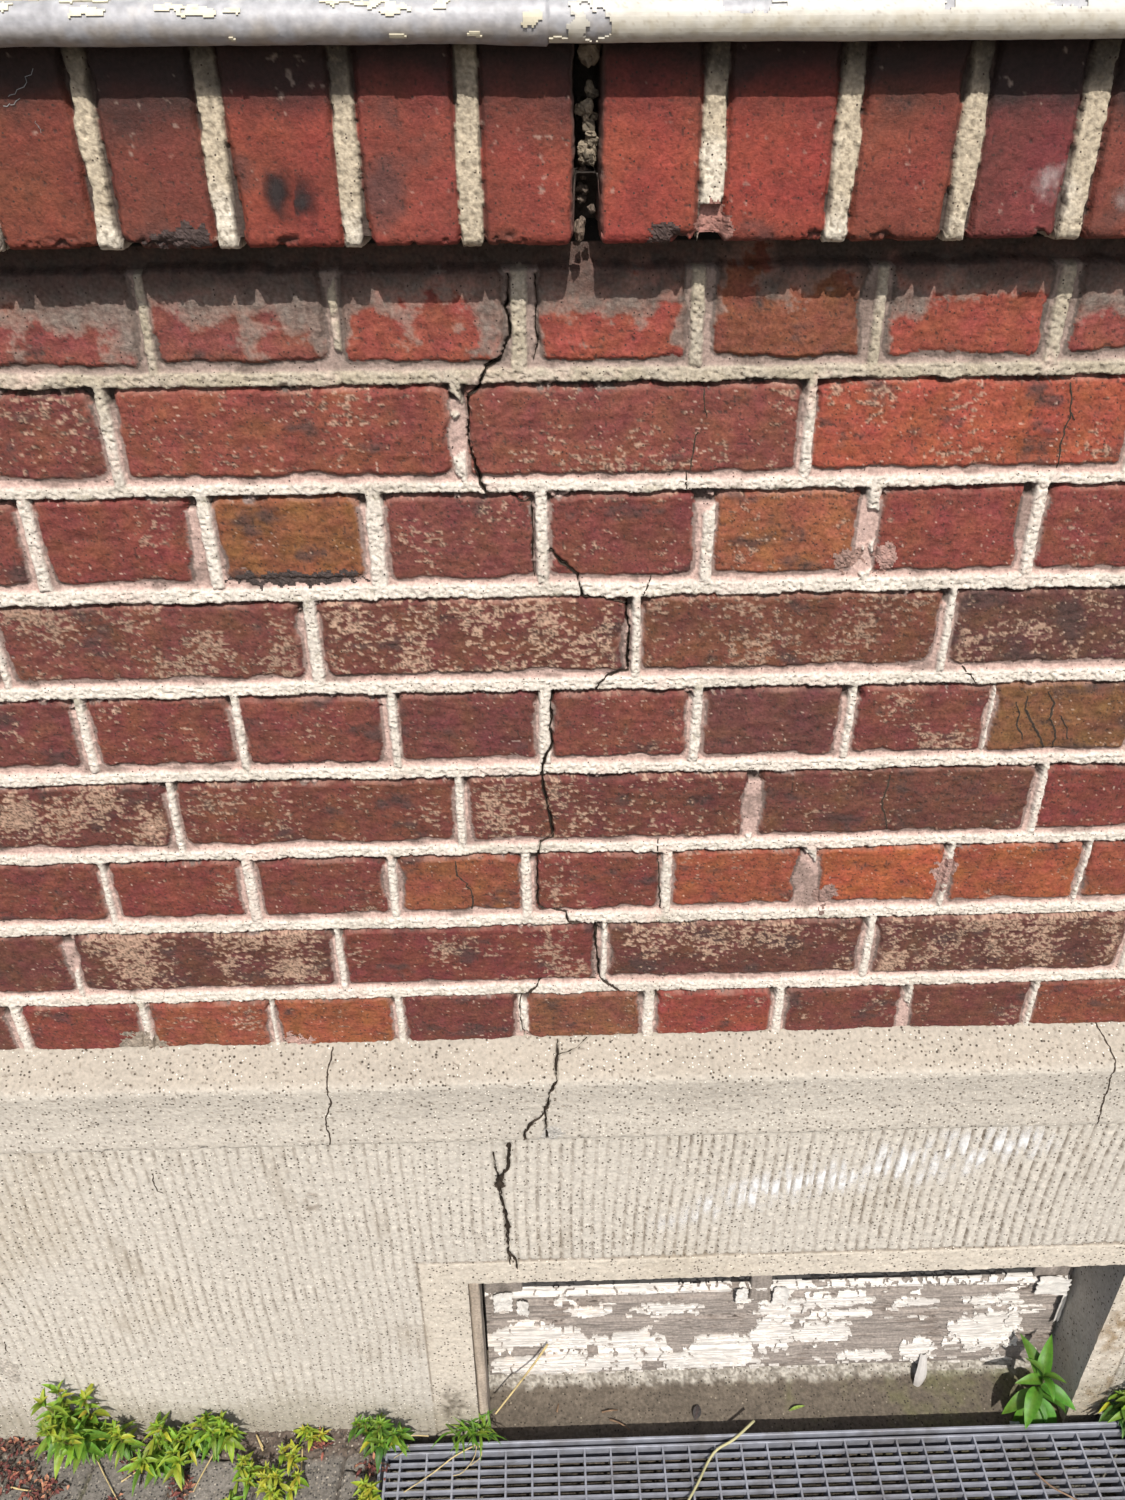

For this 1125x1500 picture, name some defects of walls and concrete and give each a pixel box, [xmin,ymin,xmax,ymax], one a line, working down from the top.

peeling [0,0,39,13]
peeling [59,0,111,19]
peeling [154,3,240,18]
peeling [319,0,411,38]
peeling [521,9,542,28]
peeling [549,0,1125,43]
crack [467,273,651,1270]
crack [283,1034,334,1145]
crack [1095,1023,1116,1124]
peeling [485,1272,1072,1387]